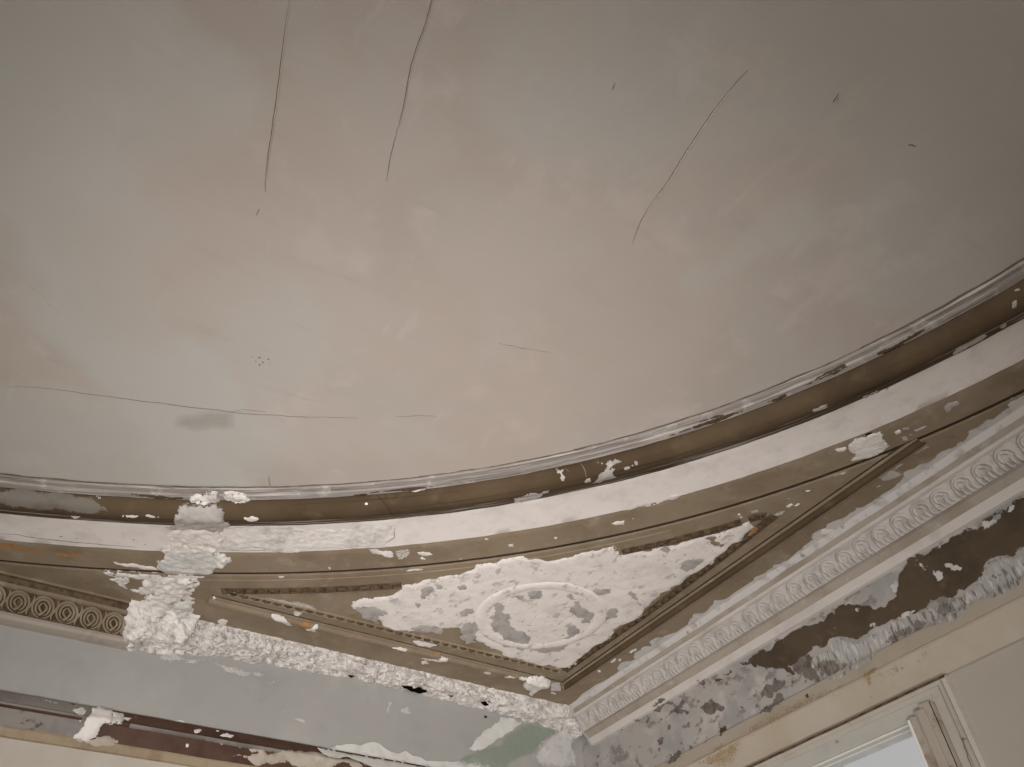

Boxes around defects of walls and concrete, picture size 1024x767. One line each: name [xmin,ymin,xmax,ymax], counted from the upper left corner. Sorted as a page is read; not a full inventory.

crack [265,3,290,178]
crack [386,0,433,181]
crack [633,71,747,241]
peeling [110,577,144,595]
flaking render [168,510,758,739]
peeling [742,498,1024,670]